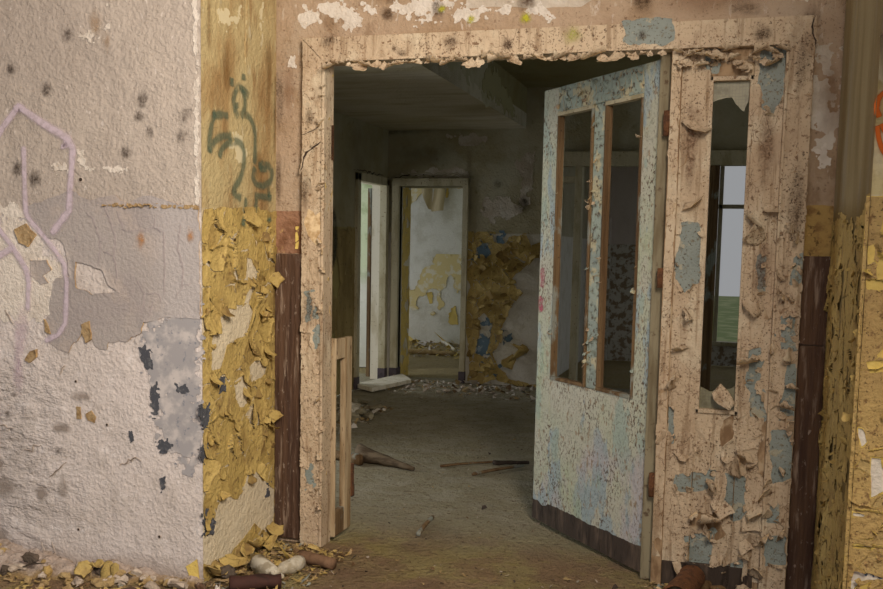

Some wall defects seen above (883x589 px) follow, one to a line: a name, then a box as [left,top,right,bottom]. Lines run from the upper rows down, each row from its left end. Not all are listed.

peeling [0,0,675,543]
peeling [186,518,284,582]